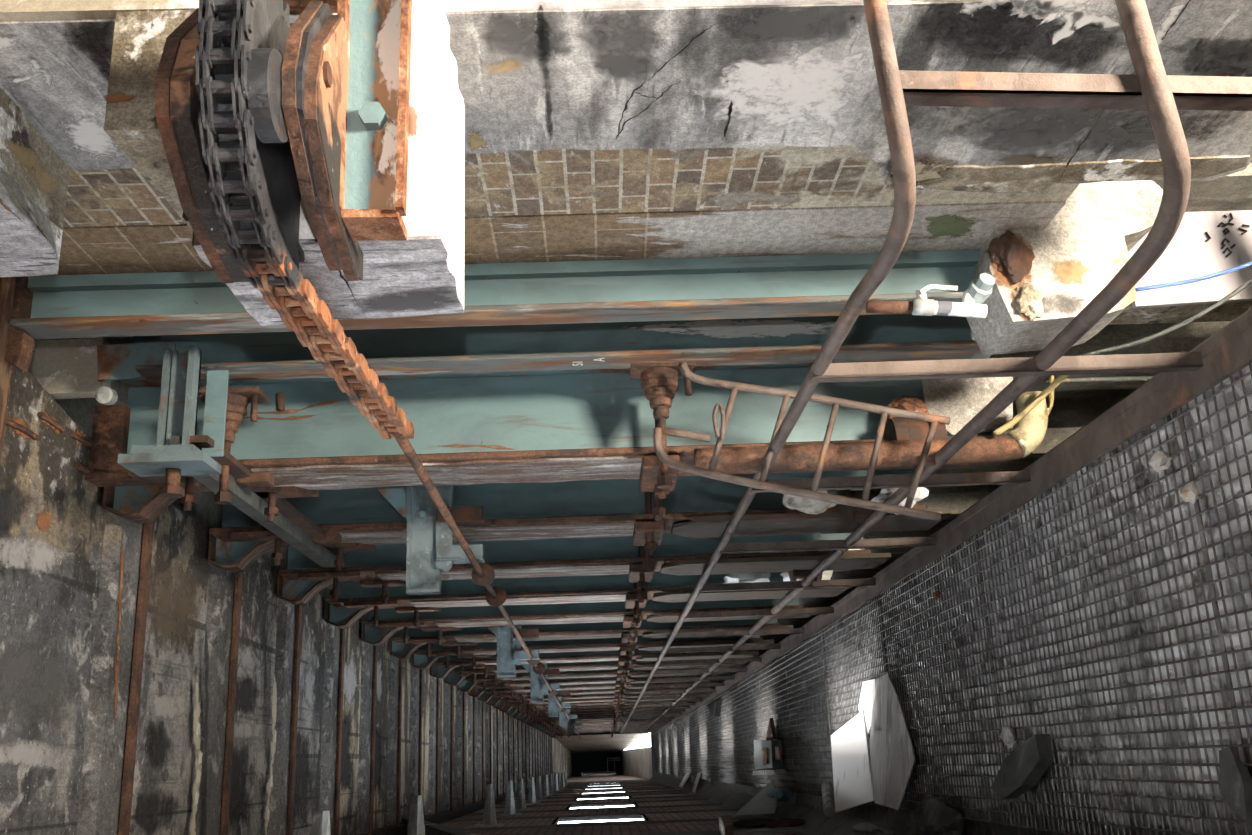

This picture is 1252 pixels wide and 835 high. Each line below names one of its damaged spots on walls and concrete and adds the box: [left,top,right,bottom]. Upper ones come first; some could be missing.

damp [66,20,112,81]
damp [962,0,1120,44]
crack [616,24,715,139]
corrosion [992,262,1032,298]